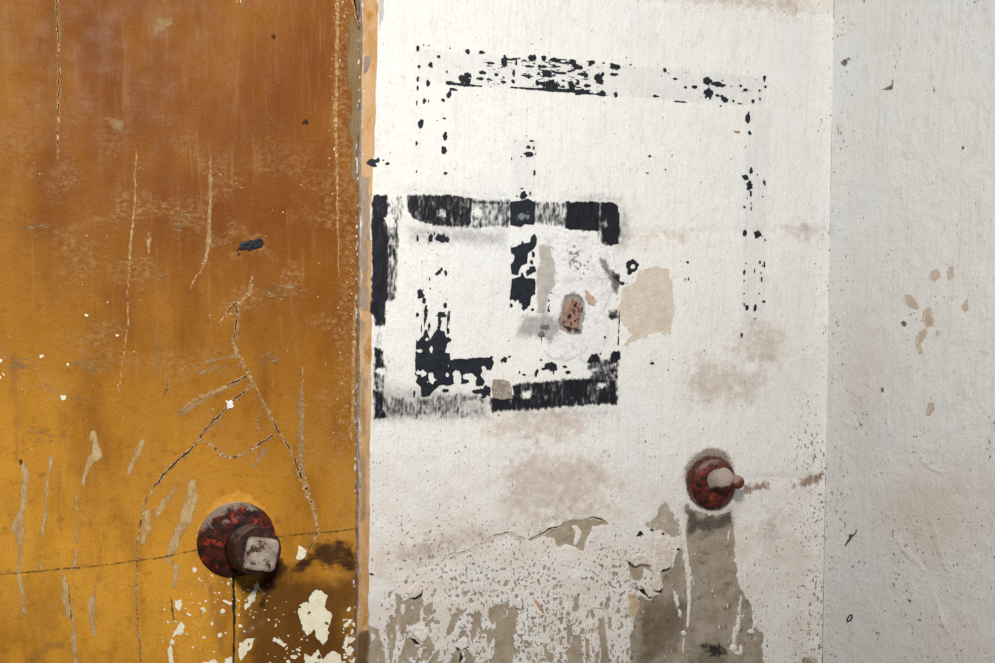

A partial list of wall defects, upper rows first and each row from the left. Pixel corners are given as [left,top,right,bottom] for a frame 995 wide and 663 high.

peeling [617,266,675,347]
crack [135,273,319,663]
rust [686,456,769,511]
peeling [168,599,206,663]
peeling [203,638,255,663]
peeling [244,584,259,610]
peeling [296,545,307,560]
peeling [273,590,355,663]
crack [442,531,526,561]
spalling [367,502,764,663]